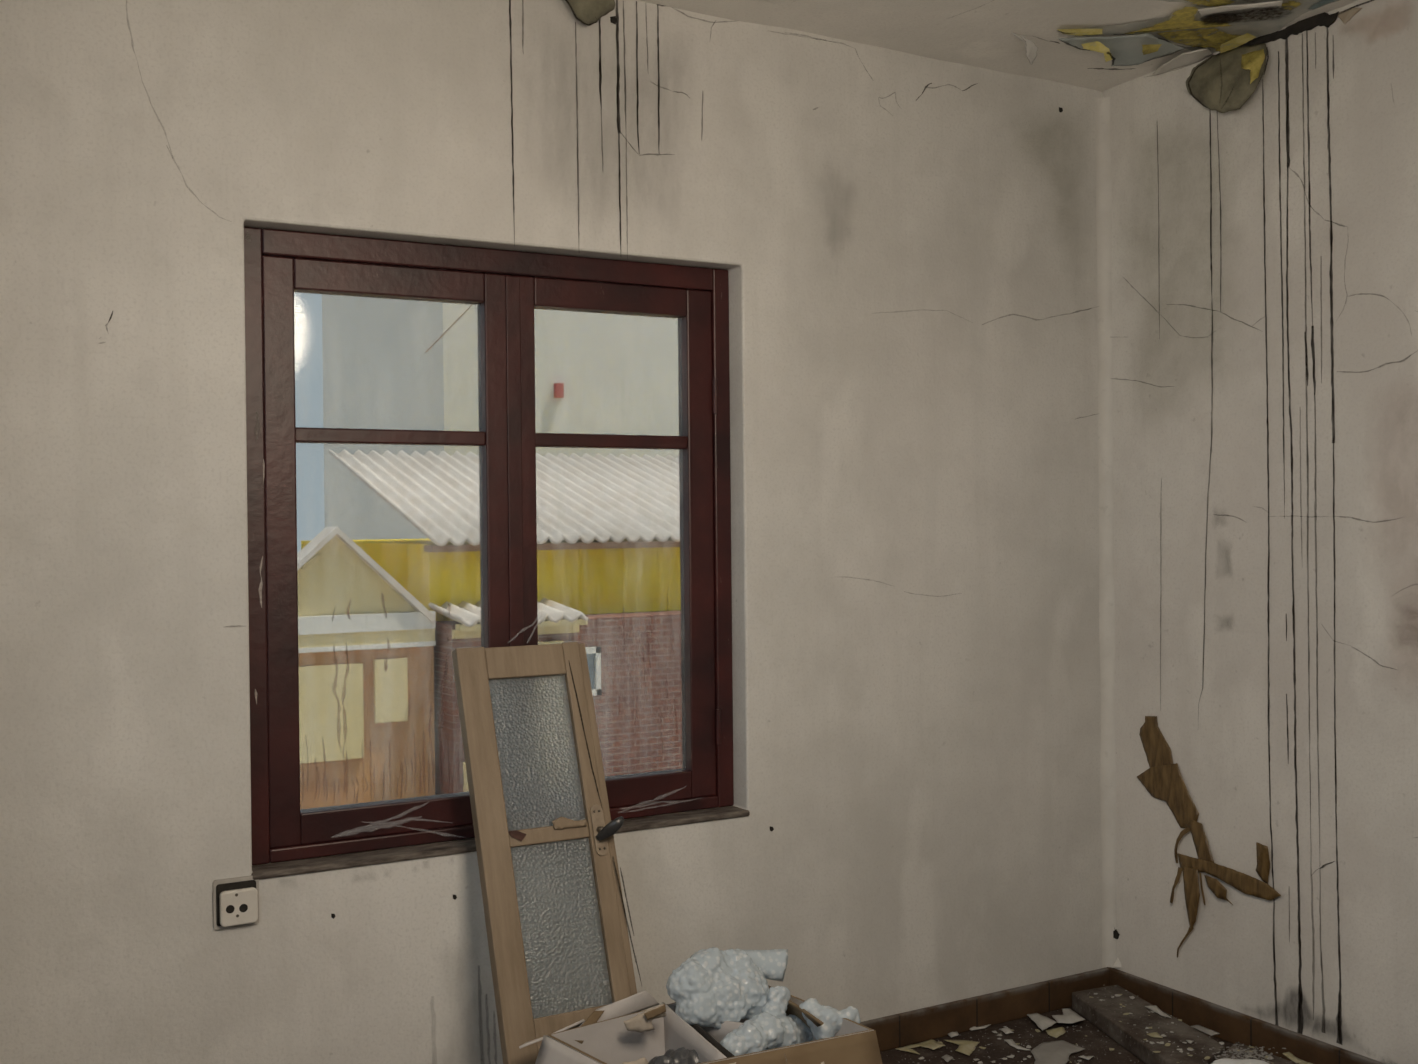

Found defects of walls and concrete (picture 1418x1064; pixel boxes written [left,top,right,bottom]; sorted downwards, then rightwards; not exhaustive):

water stain [509,0,523,247]
peeling [565,0,615,26]
water stain [599,0,660,253]
peeling [1058,33,1269,113]
water stain [1210,113,1221,399]
water stain [1198,511,1208,715]
water stain [1262,27,1342,1045]